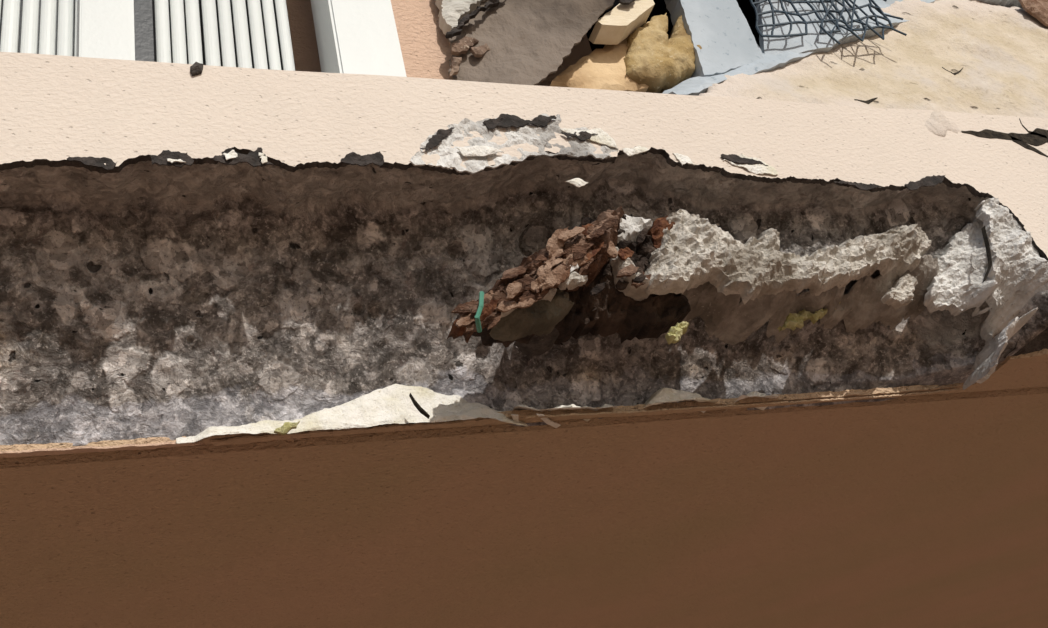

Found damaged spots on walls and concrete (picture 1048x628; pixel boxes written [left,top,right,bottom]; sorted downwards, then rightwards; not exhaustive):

peeling [435,0,635,85]
crack [962,118,1048,157]
spalling [0,114,1048,457]